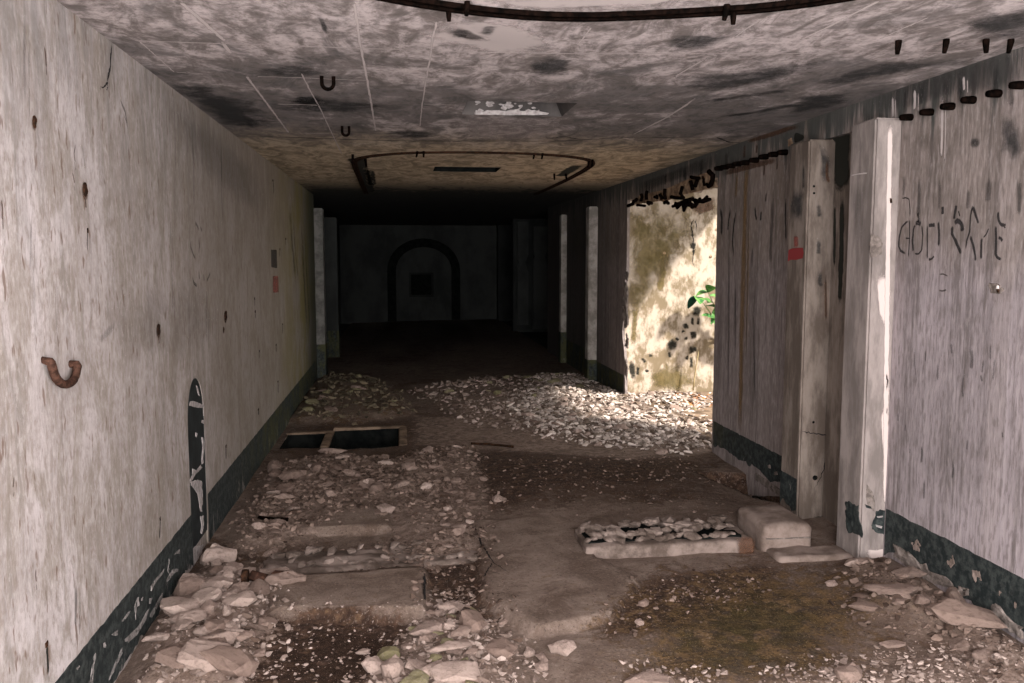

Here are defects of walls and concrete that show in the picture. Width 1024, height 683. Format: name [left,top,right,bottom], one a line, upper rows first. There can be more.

leakage [188,89,264,125]
peeling [475,101,549,115]
leakage [630,213,696,342]
leakage [668,307,701,367]
leakage [629,354,652,378]
peeling [77,386,204,680]
peeling [845,485,885,538]